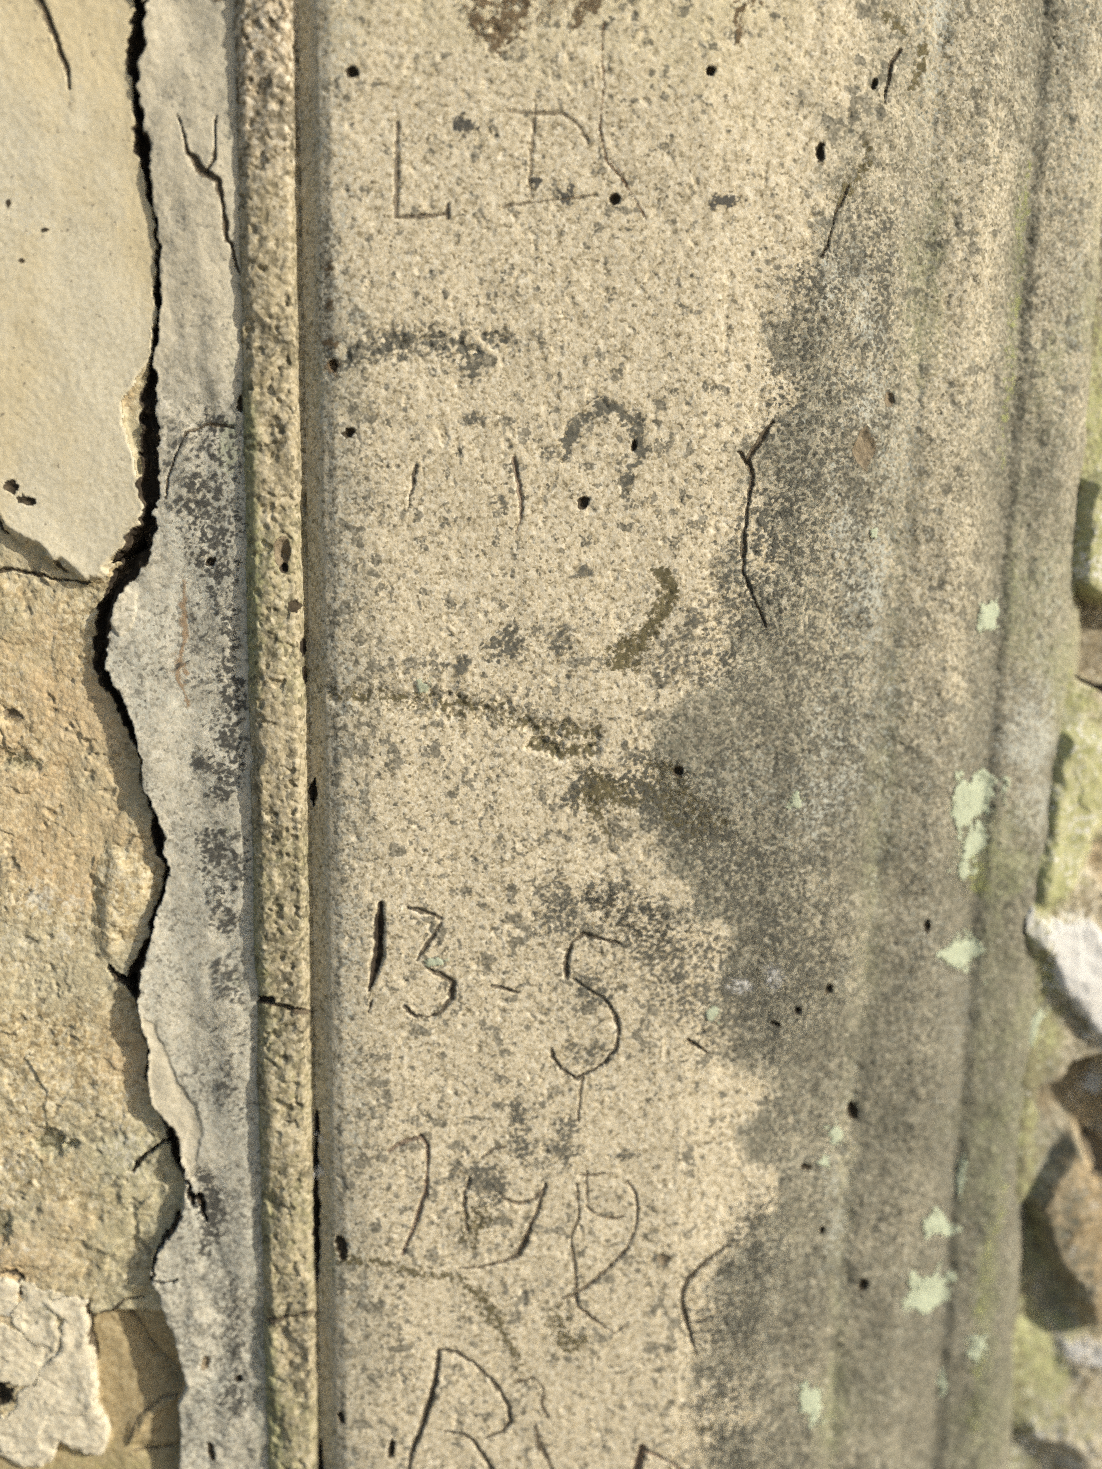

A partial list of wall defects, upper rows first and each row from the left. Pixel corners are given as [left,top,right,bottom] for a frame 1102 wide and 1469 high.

water stain [881,10,929,91]
spalling [3,479,37,505]
crack [0,0,240,1080]
spalling [121,362,152,477]
crack [737,420,774,628]
crack [1073,676,1102,693]
water stain [316,141,900,1469]
flaking render [0,520,186,1469]
water stain [877,812,946,1248]
crack [0,1268,25,1300]
crack [77,1118,208,1452]
spalling [207,1442,215,1461]